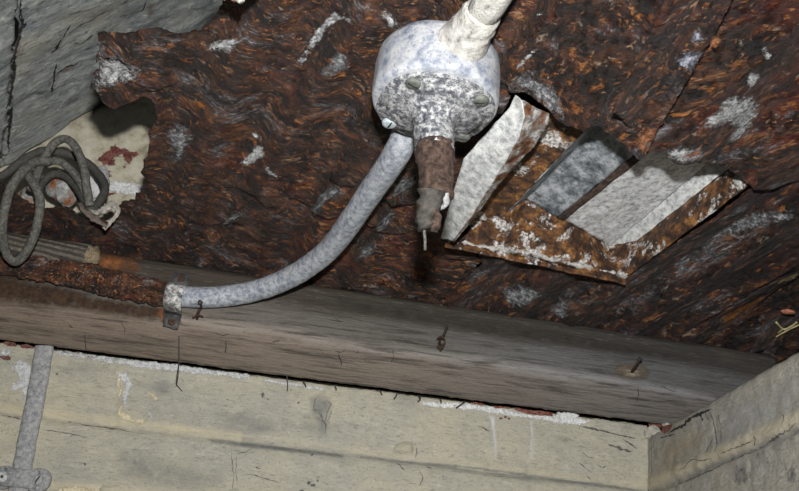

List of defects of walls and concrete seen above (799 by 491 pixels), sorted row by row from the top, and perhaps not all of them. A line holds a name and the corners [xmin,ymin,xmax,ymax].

crack [5,1,27,152]
peeling [519,76,564,117]
peeling [702,73,759,145]
peeling [636,128,656,152]
peeling [669,149,704,163]
peeling [77,146,147,231]
peeling [703,203,794,248]
rust [99,255,136,270]
rust [0,275,163,321]
crack [578,409,796,487]